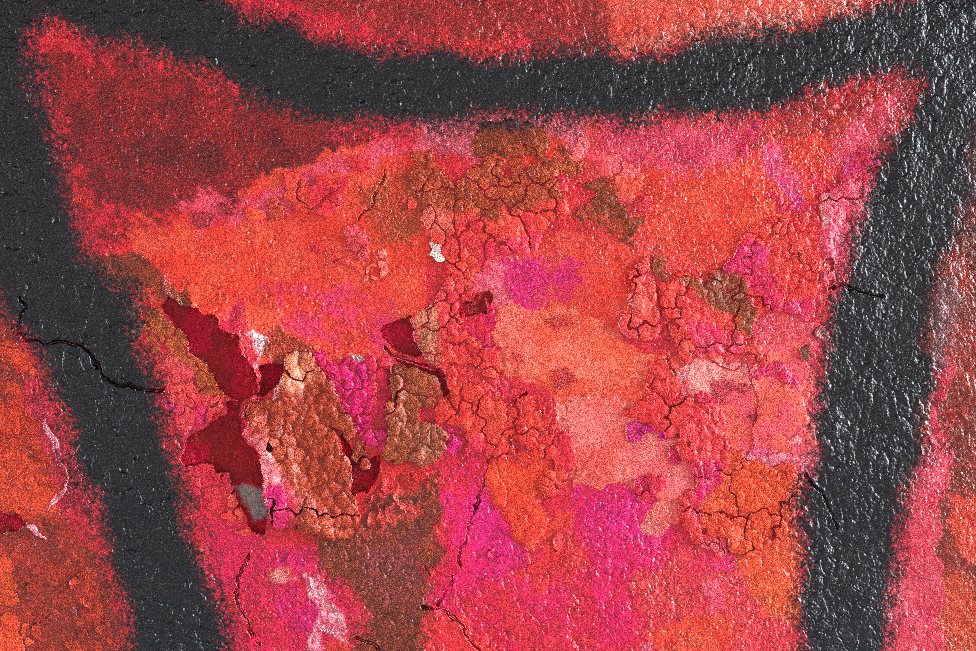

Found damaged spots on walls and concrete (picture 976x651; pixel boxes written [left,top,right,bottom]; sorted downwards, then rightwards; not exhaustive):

peeling [0,338,94,534]
peeling [116,117,885,576]
peeling [0,554,56,651]
peeling [49,569,123,651]
crack [423,445,495,651]